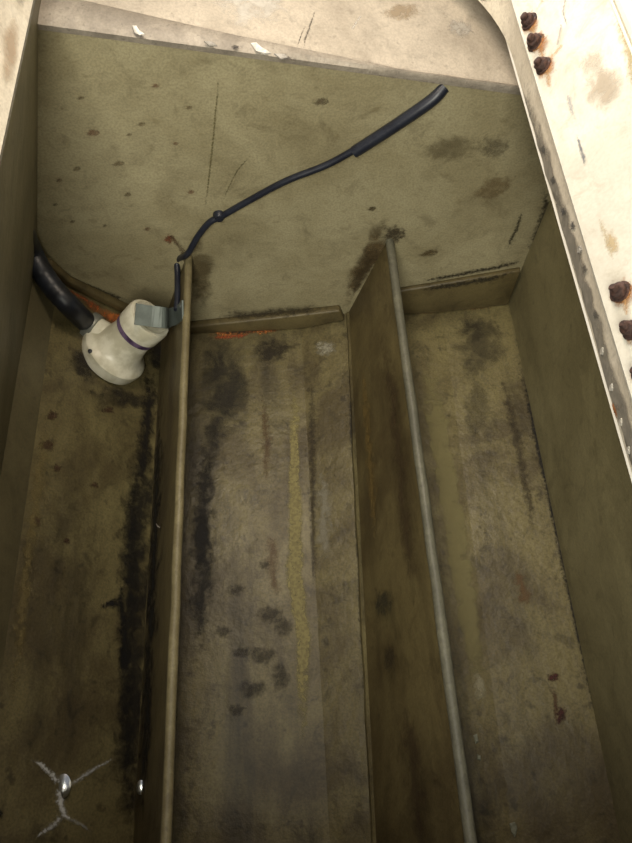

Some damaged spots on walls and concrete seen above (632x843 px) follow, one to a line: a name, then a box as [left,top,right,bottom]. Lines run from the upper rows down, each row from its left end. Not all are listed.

rust [529,20,562,87]
damp [74,353,92,376]
damp [149,341,161,369]
damp [207,354,245,447]
damp [228,308,318,319]
damp [91,380,162,813]
damp [190,463,212,629]
damp [286,398,310,711]
damp [426,402,480,659]
damp [525,389,585,668]